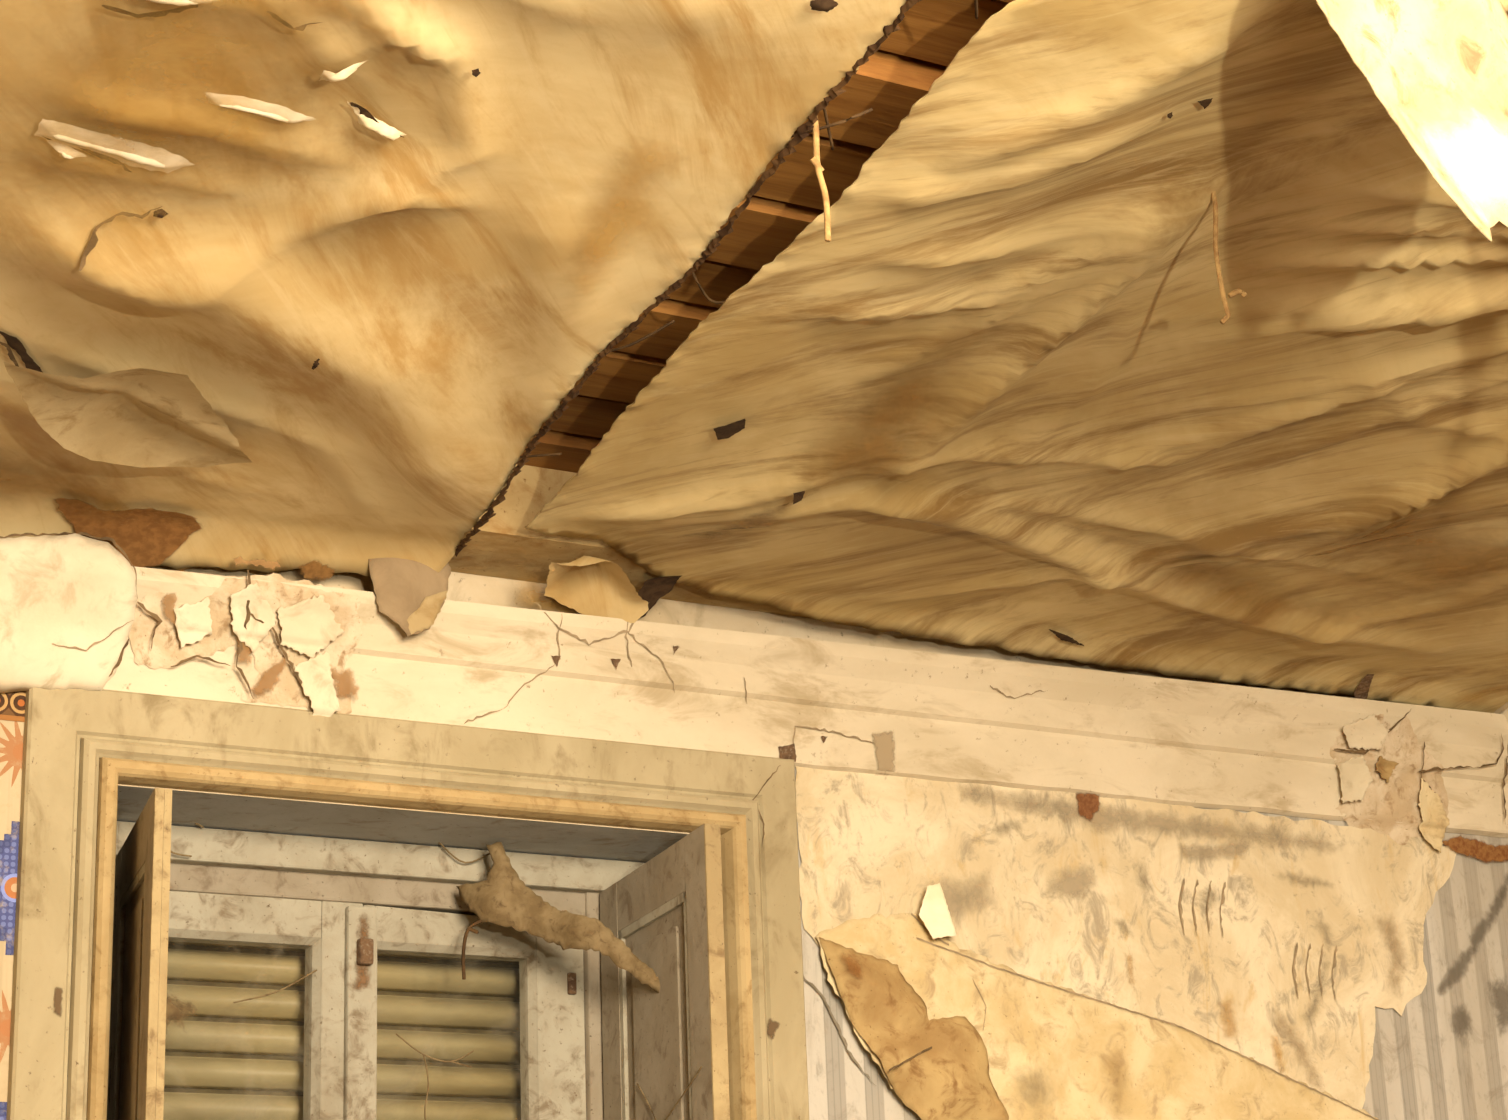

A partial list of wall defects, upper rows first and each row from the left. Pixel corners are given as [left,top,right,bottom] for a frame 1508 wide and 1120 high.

crack [79,206,162,271]
crack [0,342,19,367]
flaking render [0,532,364,717]
leakage [1016,802,1306,857]
rust [357,919,368,939]
leakage [943,886,982,913]
leakage [1179,878,1226,935]
rust [356,965,369,989]
leakage [1293,943,1337,1000]
leakage [803,975,876,1086]